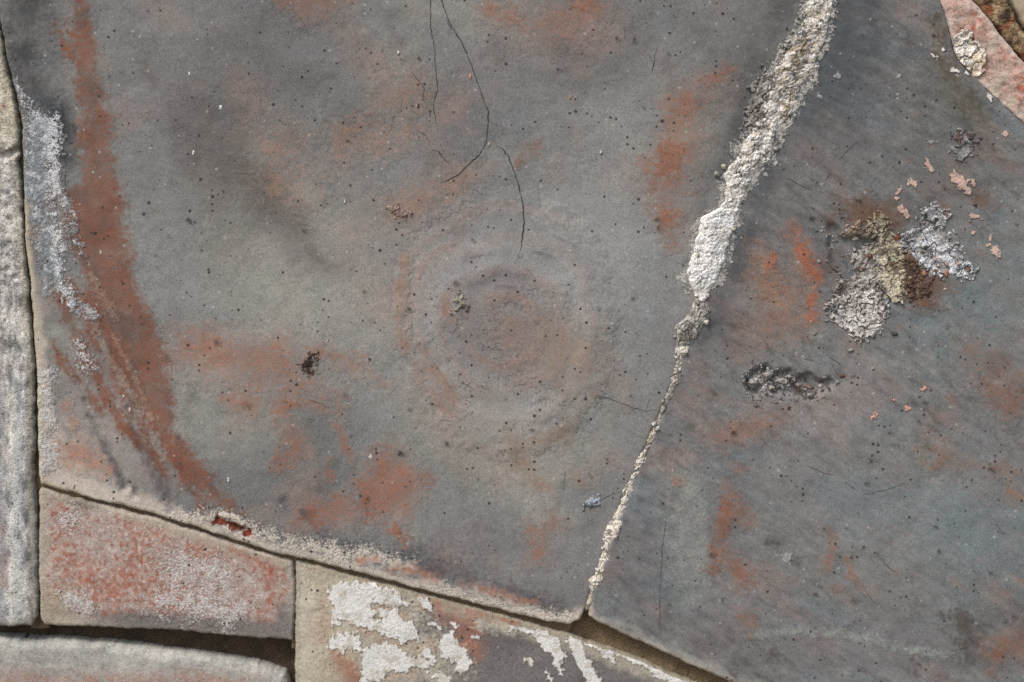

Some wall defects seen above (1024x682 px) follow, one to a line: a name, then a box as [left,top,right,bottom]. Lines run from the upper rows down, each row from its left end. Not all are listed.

spalling [931,26,989,77]
crack [411,0,525,252]
rust [621,55,746,256]
rust [47,0,449,544]
water stain [0,0,577,682]
spalling [736,359,845,410]
crack [877,282,892,320]
spalling [808,124,983,352]
peeling [985,235,1001,261]
spalling [210,511,253,537]
rust [220,543,287,617]
peeling [326,579,482,682]